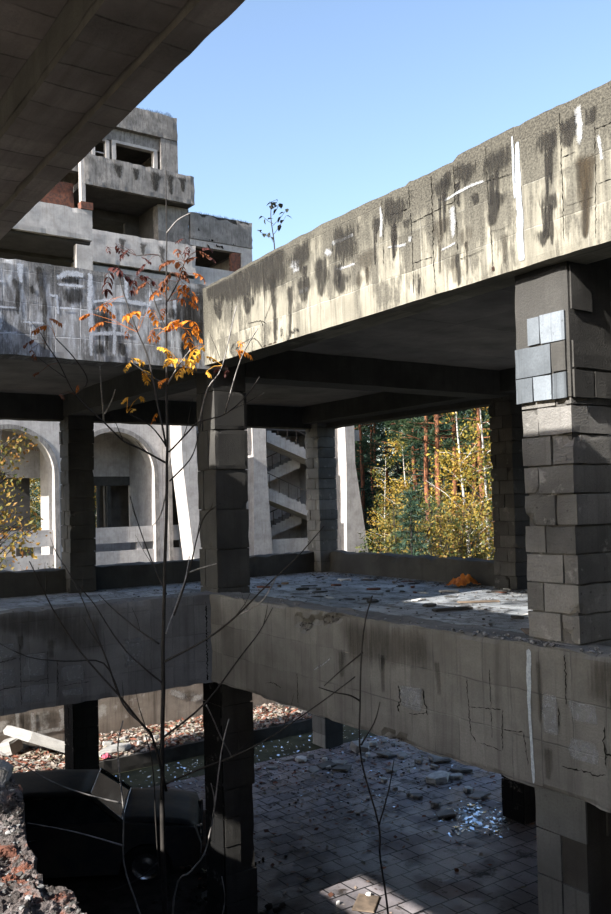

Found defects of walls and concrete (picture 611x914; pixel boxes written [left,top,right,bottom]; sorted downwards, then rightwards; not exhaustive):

water stain [115,164,139,180]
water stain [151,171,186,195]
water stain [373,197,411,264]
water stain [433,144,510,285]
water stain [536,106,595,247]
water stain [0,224,359,363]
crack [397,686,428,715]
crack [466,669,528,760]
crack [558,655,567,727]
crack [563,727,611,777]